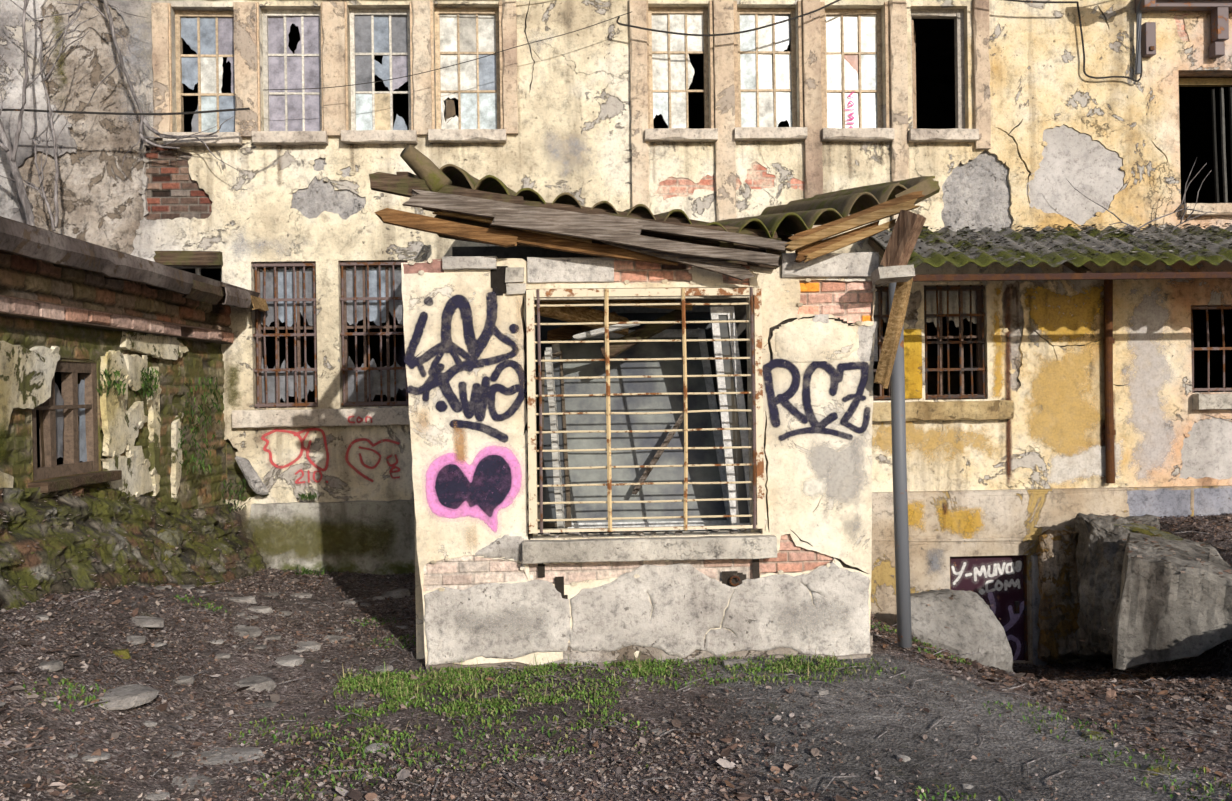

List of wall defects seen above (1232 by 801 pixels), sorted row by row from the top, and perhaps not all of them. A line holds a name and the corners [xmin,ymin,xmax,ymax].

flaking render [0,0,213,254]
spalling [291,153,367,220]
flaking render [654,175,716,200]
flaking render [736,162,805,191]
spalling [941,150,1013,232]
flaking render [1026,125,1126,225]
flaking render [796,278,878,366]
flaking render [0,471,14,488]
flaking render [0,341,60,431]
flaking render [99,331,189,502]
flaking render [1179,415,1232,480]
leakage [231,508,395,561]